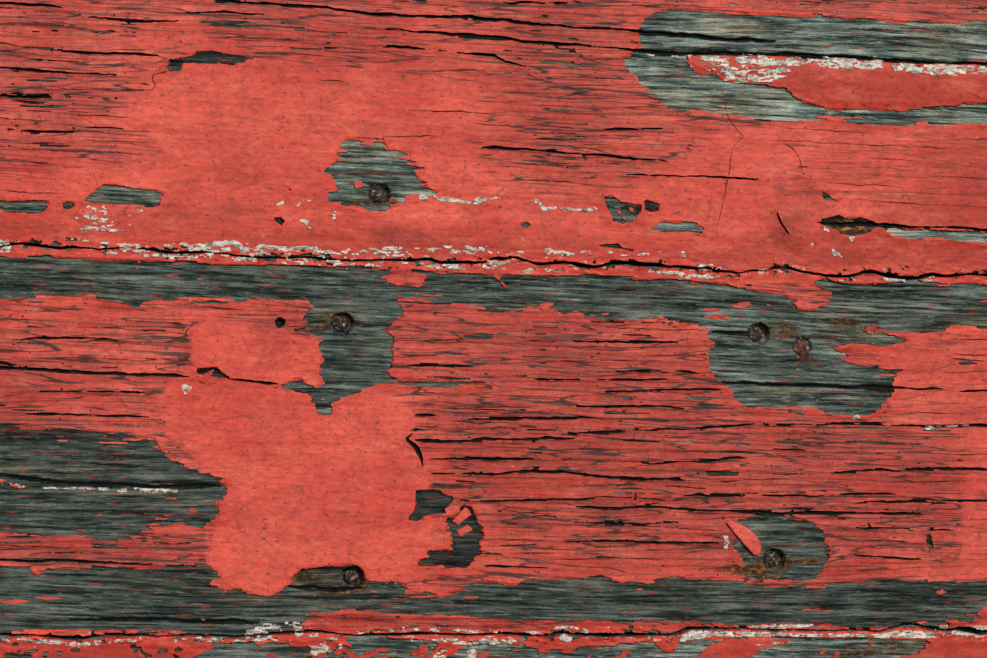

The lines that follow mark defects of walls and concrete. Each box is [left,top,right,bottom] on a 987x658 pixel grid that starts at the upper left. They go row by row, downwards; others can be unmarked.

crack [0,2,171,165]
crack [87,0,987,223]
peeling [622,2,987,127]
crack [4,188,61,196]
peeling [324,138,500,220]
crack [816,183,987,233]
peeling [0,238,987,423]
peeling [0,422,227,546]
peeling [408,488,490,568]
peeling [0,508,987,658]
crack [391,327,987,569]
rust [719,557,818,578]